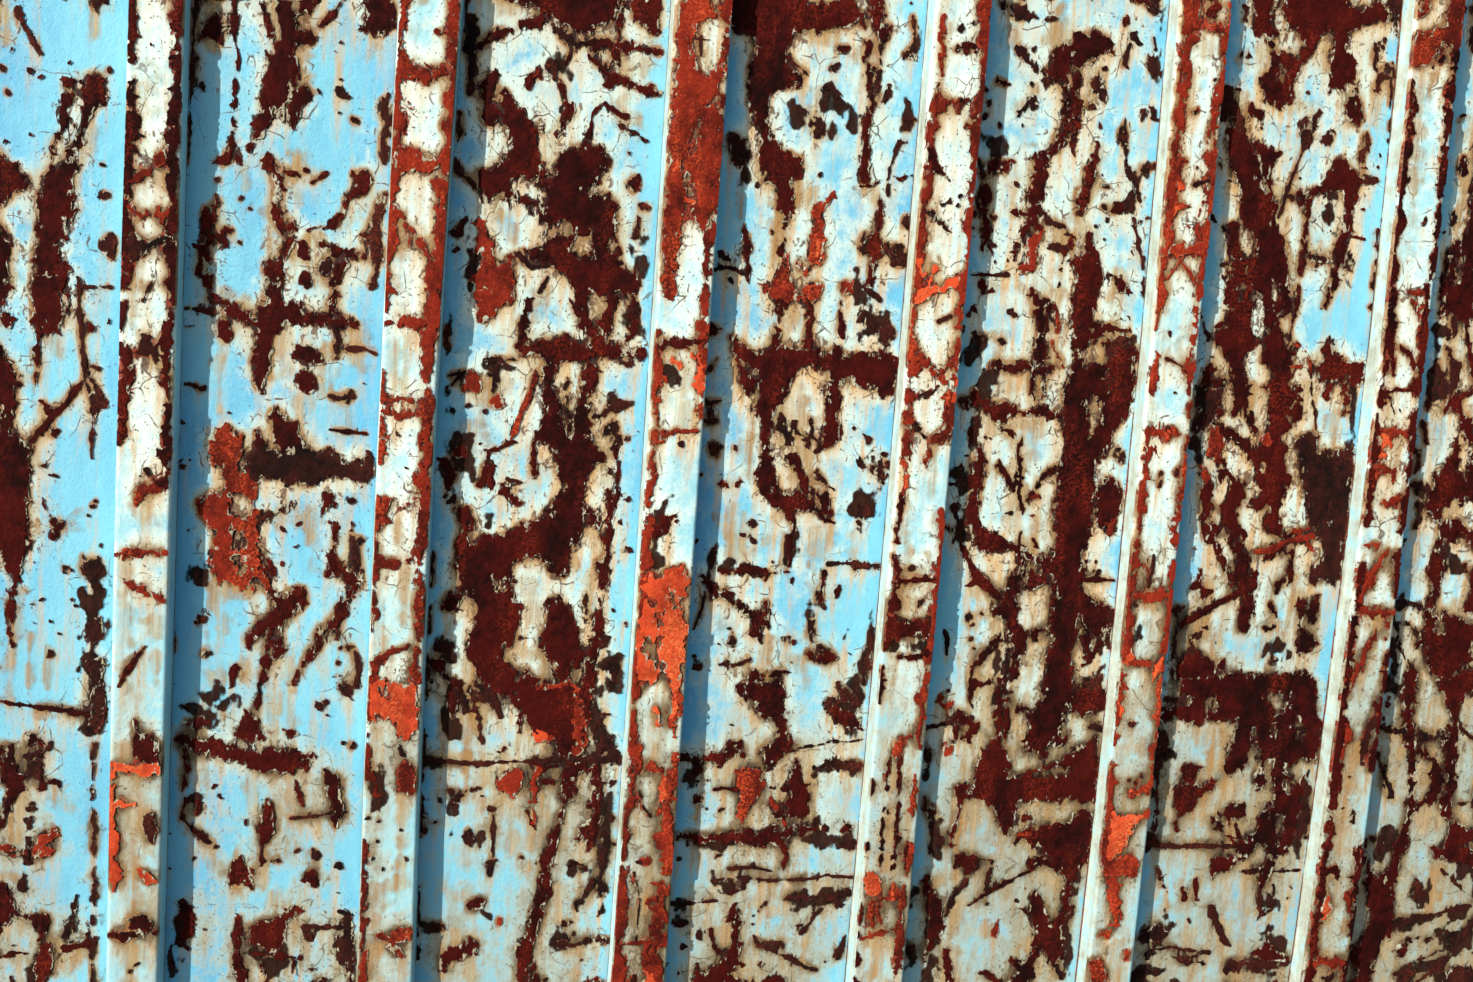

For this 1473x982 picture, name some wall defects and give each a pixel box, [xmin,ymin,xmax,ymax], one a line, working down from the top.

peeling [1411,0,1466,84]
peeling [926,146,977,233]
corrosion [0,67,109,688]
corrosion [89,0,1200,982]
peeling [662,352,718,395]
peeling [852,354,966,494]
peeling [1368,342,1418,508]
peeling [889,565,936,661]
corrosion [0,543,168,982]
peeling [364,679,431,892]
peeling [1089,773,1149,982]
peeling [1320,541,1405,922]